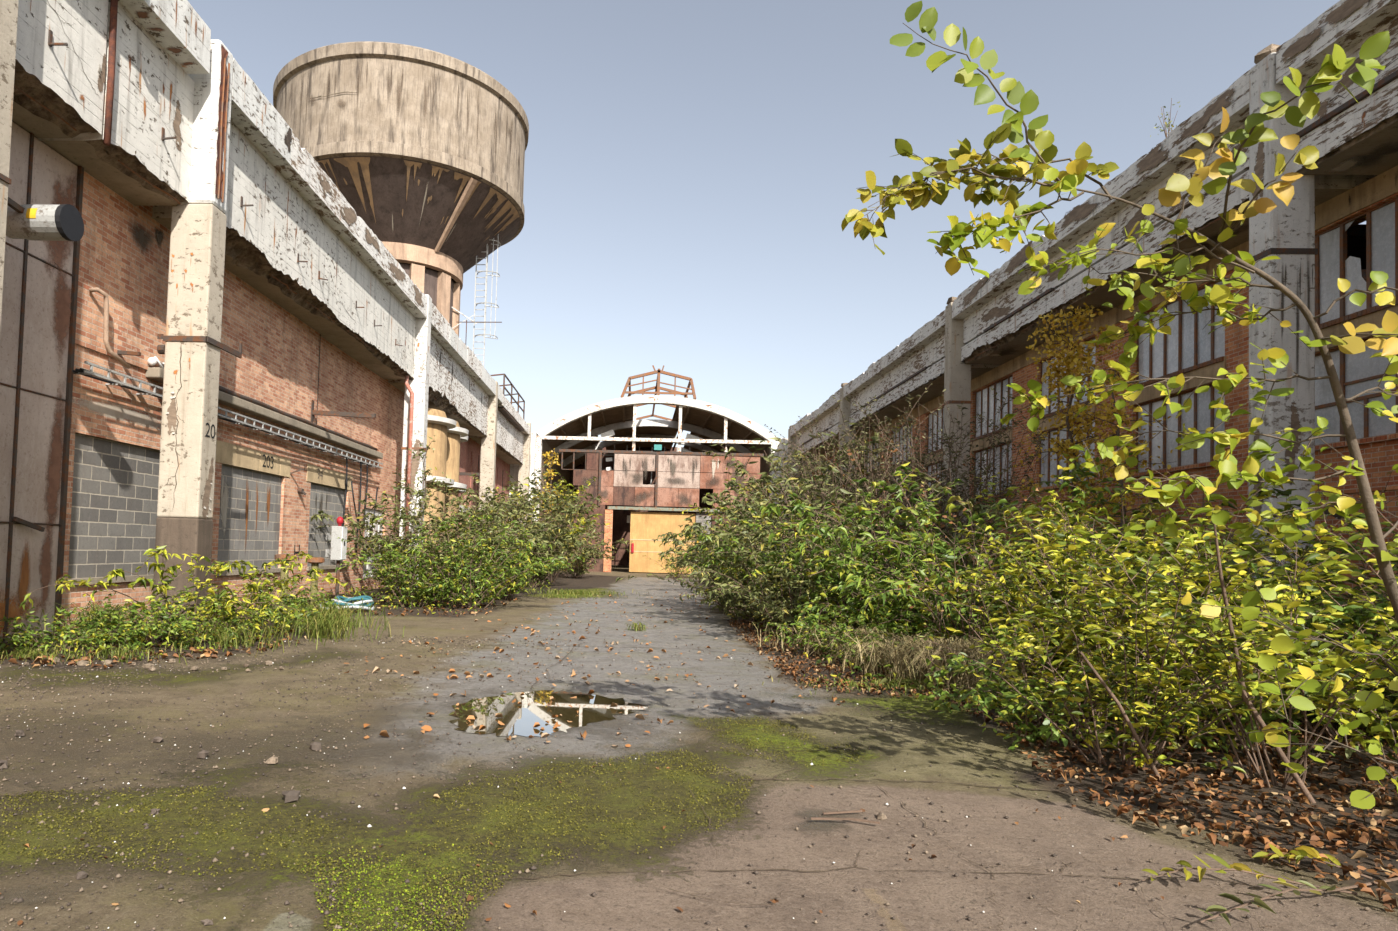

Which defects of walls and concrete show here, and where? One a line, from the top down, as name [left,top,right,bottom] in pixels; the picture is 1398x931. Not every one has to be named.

peeling [1280,0,1369,64]
peeling [1314,37,1396,119]
spalling [13,54,189,206]
peeling [284,128,292,152]
spalling [1297,112,1398,174]
rust [53,178,77,207]
peeling [318,157,424,307]
rust [46,241,72,354]
rust [0,395,64,635]
rust [245,485,270,550]